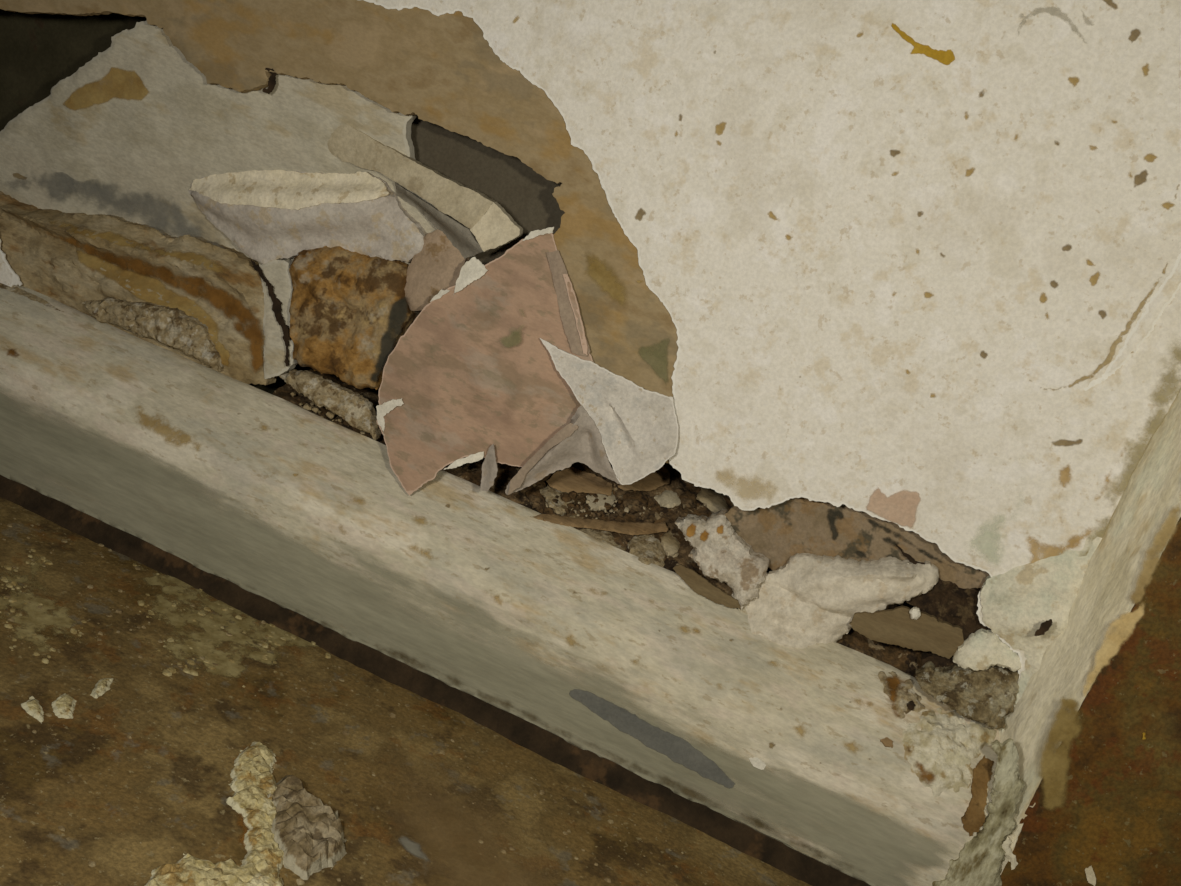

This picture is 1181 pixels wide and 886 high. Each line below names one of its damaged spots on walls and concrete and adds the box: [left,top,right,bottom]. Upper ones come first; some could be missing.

spalling [0,9,147,131]
spalling [0,283,64,312]
crack [1053,265,1167,390]
spalling [249,364,312,394]
leakage [1115,349,1181,493]
peeling [867,489,920,527]
peeling [673,564,741,610]
peeling [1040,507,1180,810]
peeling [569,689,735,788]
spalling [878,628,1025,886]
peeling [1085,865,1096,886]